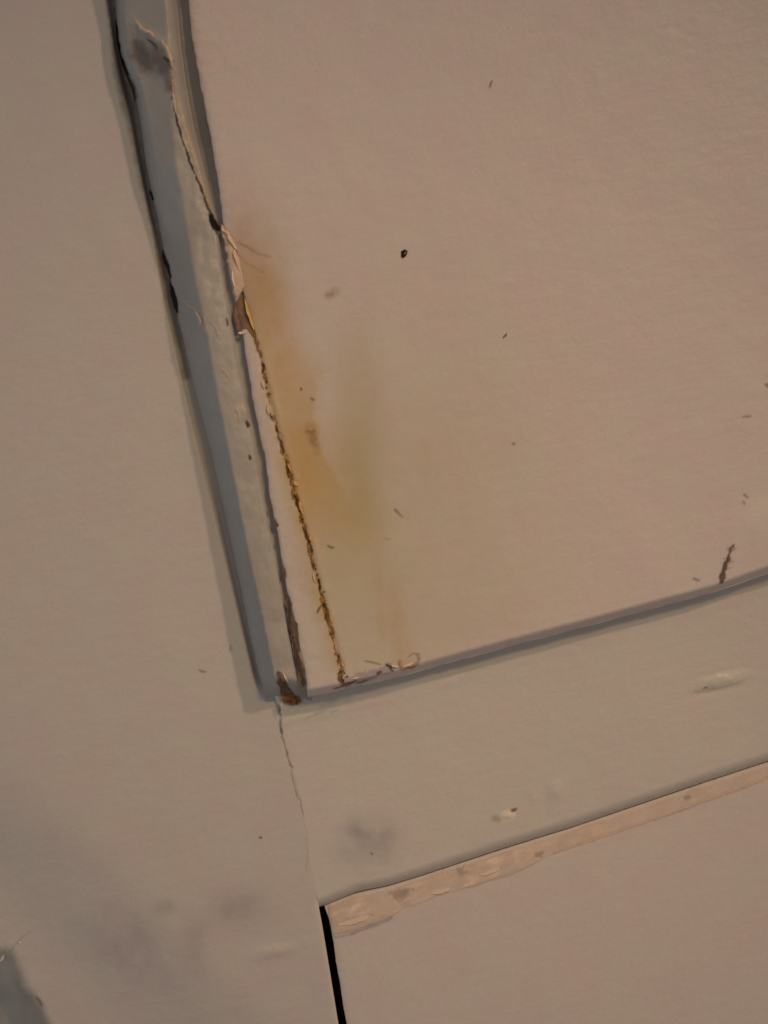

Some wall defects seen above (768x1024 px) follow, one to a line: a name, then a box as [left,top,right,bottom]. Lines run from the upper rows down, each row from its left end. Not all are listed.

peeling [183,225,256,338]
peeling [277,596,306,696]